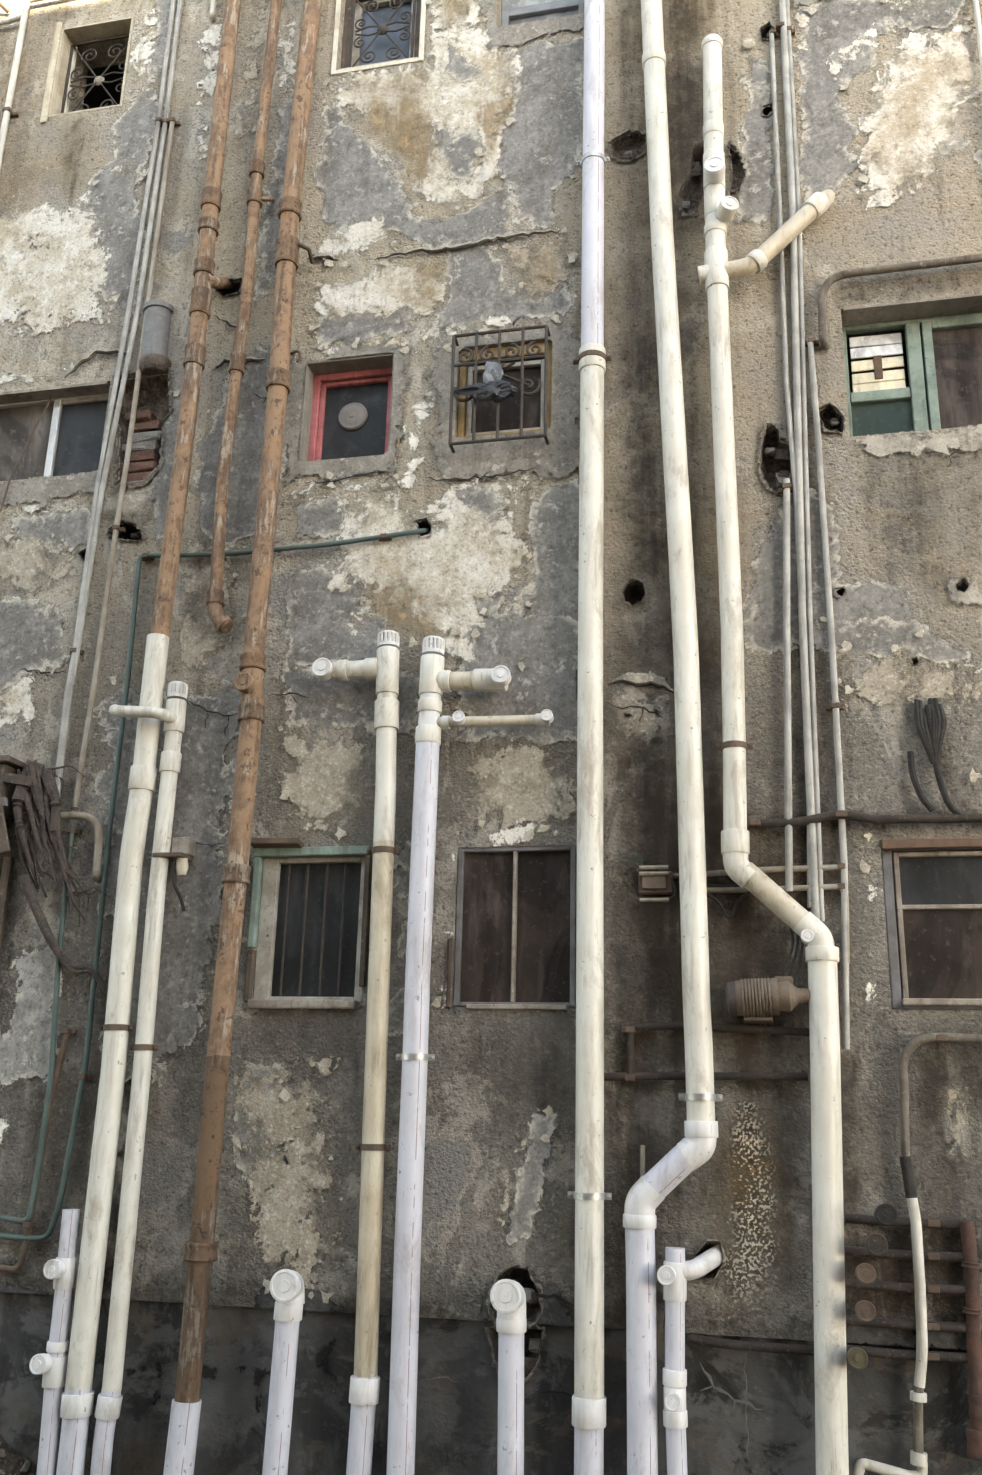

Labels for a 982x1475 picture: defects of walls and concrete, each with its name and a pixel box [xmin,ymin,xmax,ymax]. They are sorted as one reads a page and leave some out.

peeling [0,0,184,339]
crack [64,347,134,379]
crack [307,251,338,267]
peeling [309,0,584,359]
crack [374,229,562,260]
peeling [727,0,982,228]
peeling [125,340,271,1090]
peeling [278,391,579,846]
water stain [699,644,718,694]
water stain [704,807,773,937]
water stain [748,856,787,893]
water stain [722,1017,800,1304]